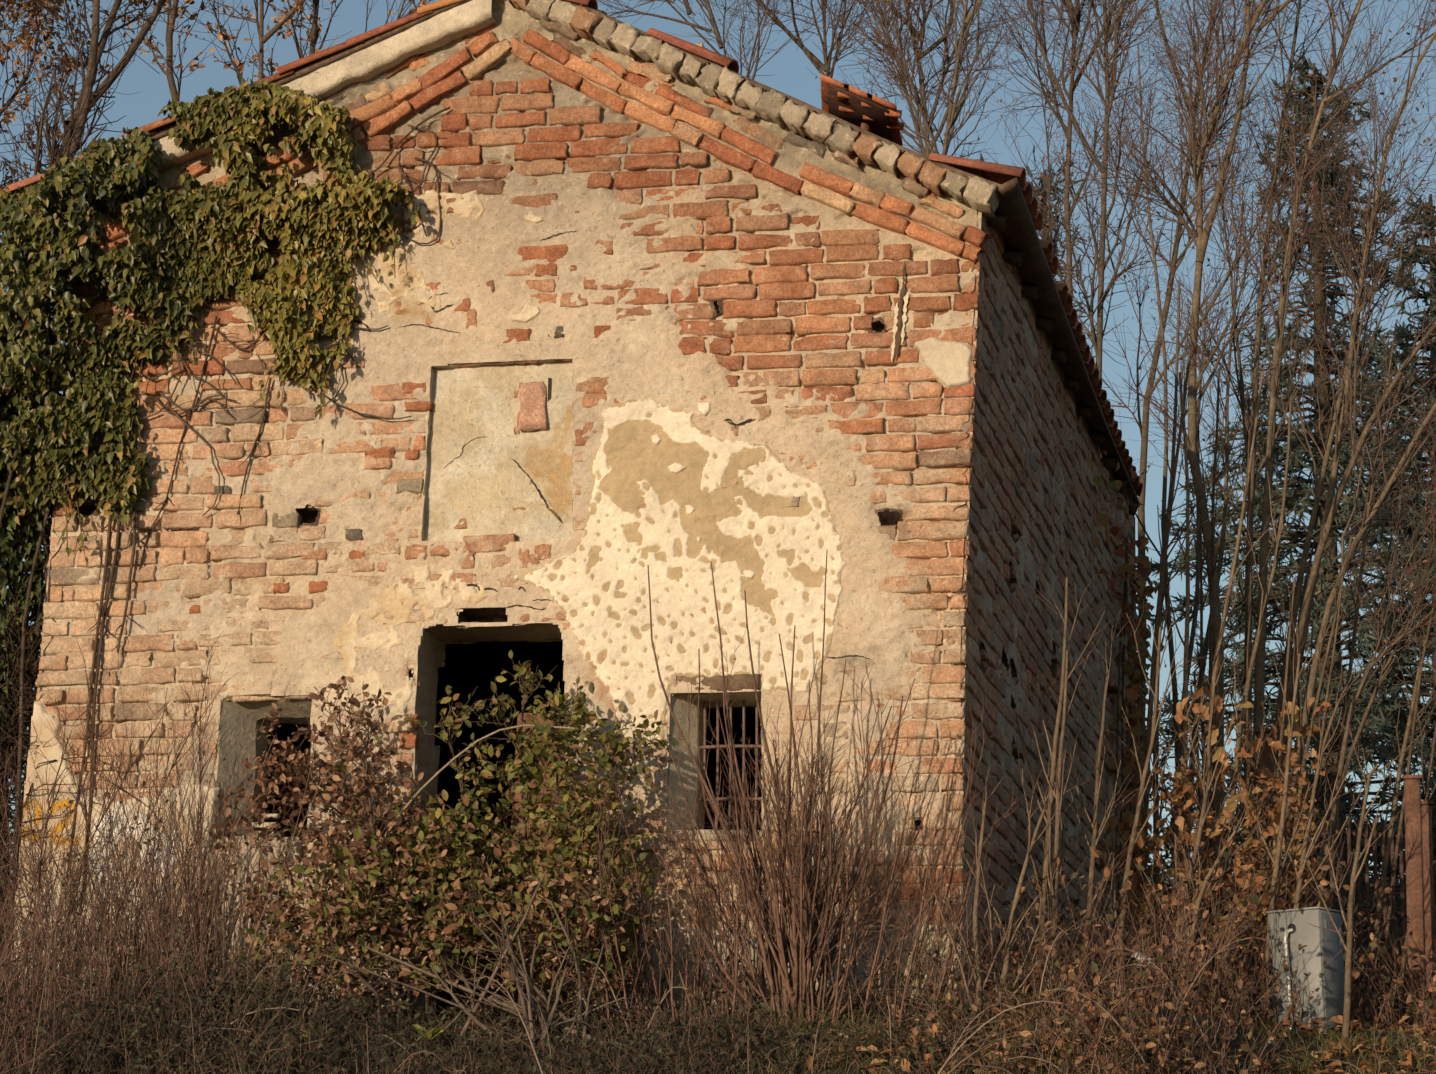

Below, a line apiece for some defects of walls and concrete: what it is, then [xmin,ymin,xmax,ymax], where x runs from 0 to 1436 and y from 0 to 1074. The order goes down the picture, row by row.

spalling [709,300,723,318]
spalling [867,317,889,333]
crack [512,459,563,524]
peeling [514,399,846,761]
peeling [324,565,488,723]